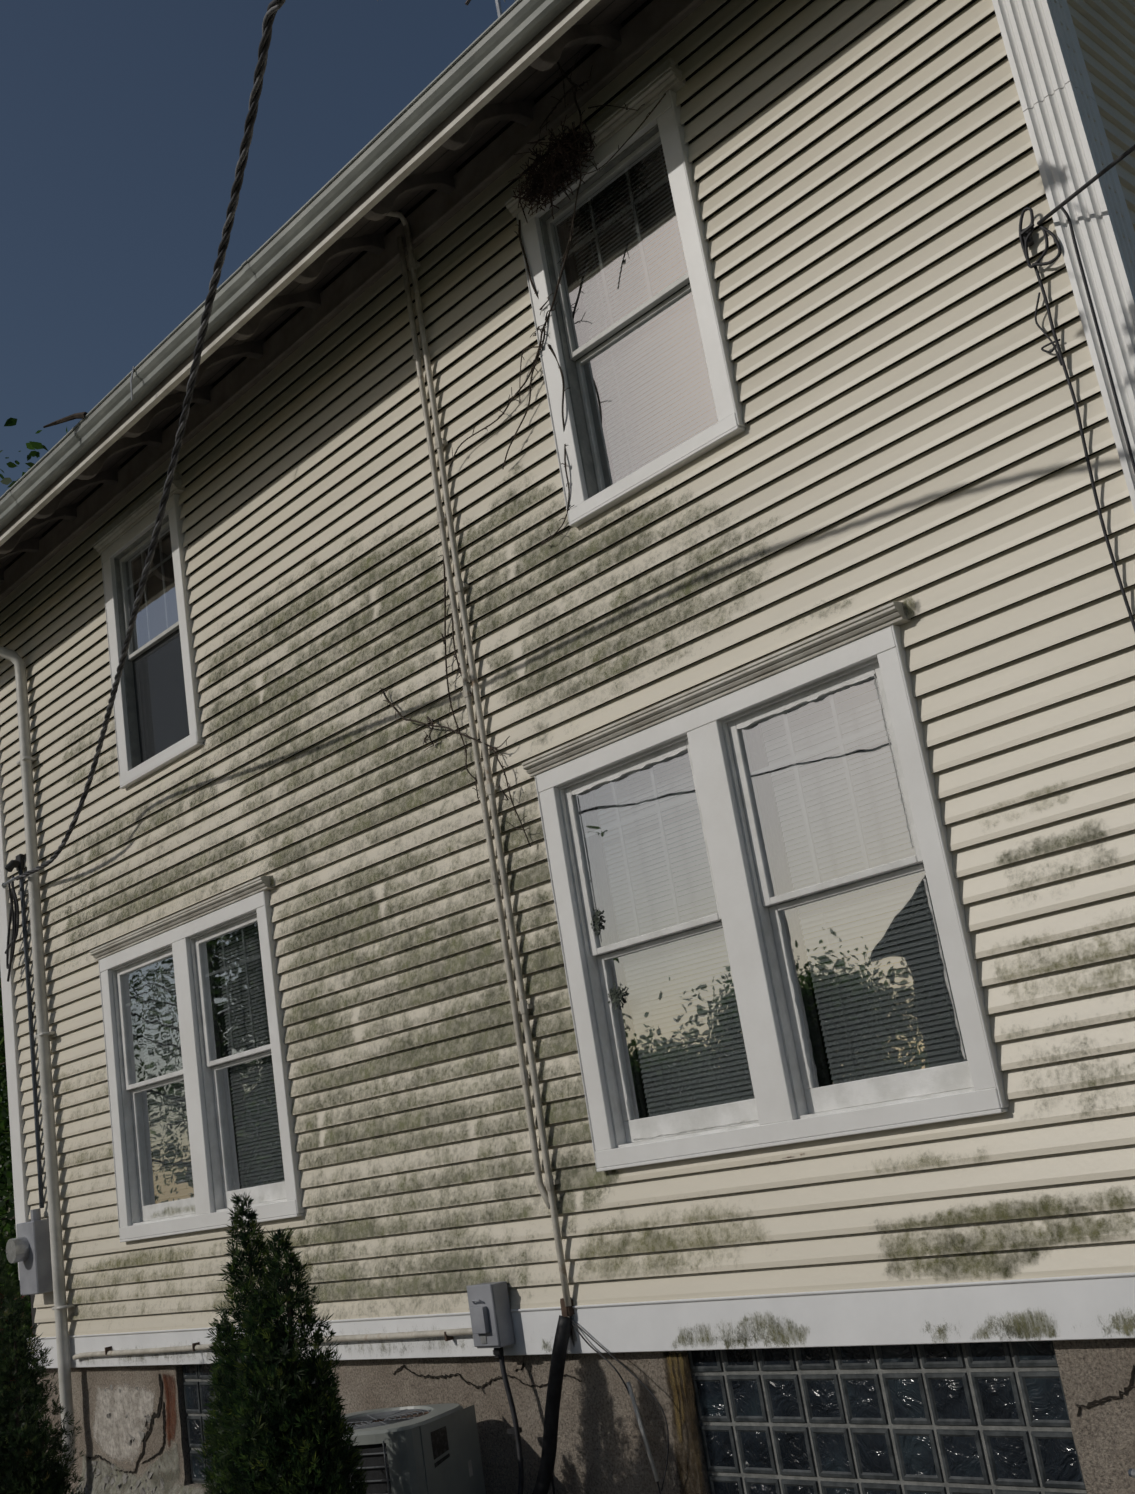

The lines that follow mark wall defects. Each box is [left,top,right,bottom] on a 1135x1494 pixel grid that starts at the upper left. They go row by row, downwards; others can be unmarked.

damp [1000,826,1104,863]
damp [53,486,765,1301]
damp [881,1193,1134,1278]
damp [976,1310,1056,1338]
crack [87,1373,166,1474]
crack [392,1358,582,1394]
damp [663,1315,806,1494]
crack [1076,1365,1135,1417]